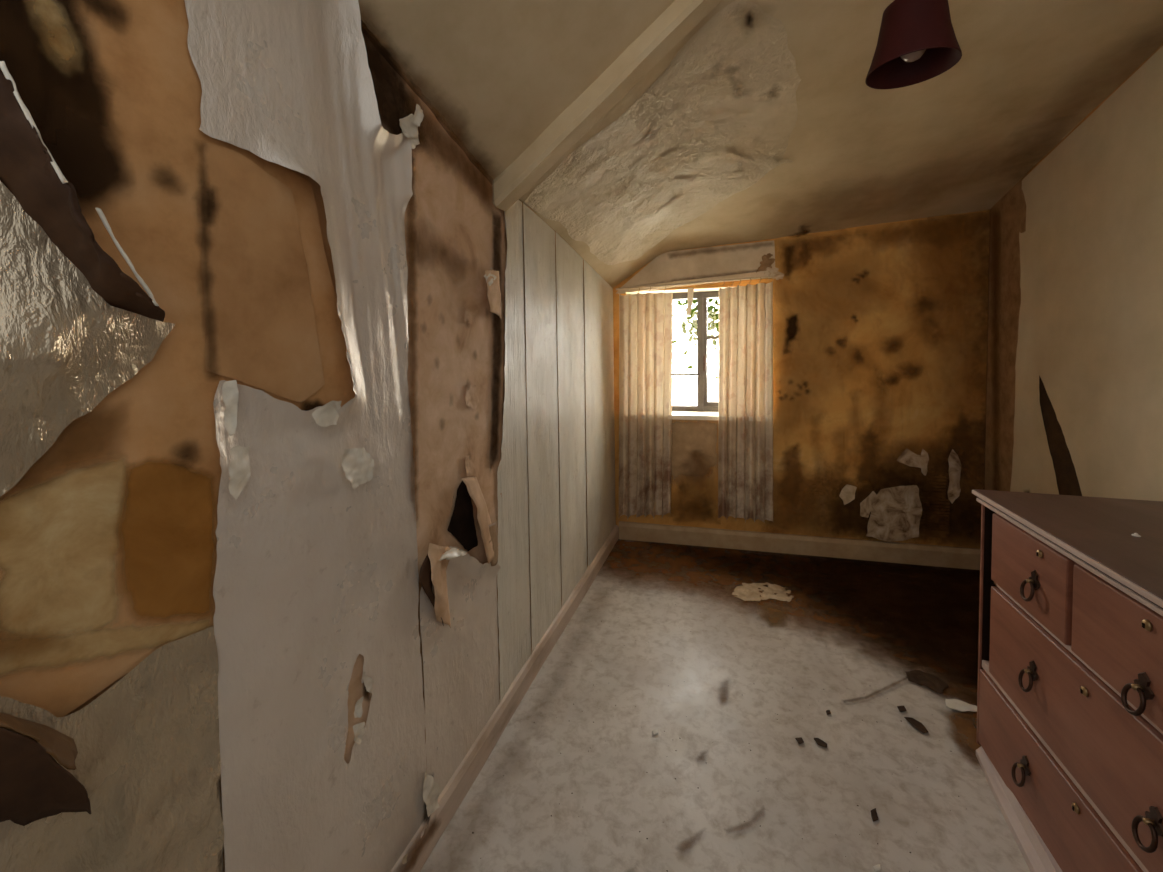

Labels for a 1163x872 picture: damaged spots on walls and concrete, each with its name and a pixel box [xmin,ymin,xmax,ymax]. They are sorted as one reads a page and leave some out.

peeling [361,25,506,582]
leakage [784,315,798,353]
leakage [786,227,843,272]
peeling [222,380,251,499]
peeling [312,401,341,427]
peeling [342,447,375,489]
leakage [770,417,986,546]
spalling [344,654,374,764]
peeling [0,712,91,826]